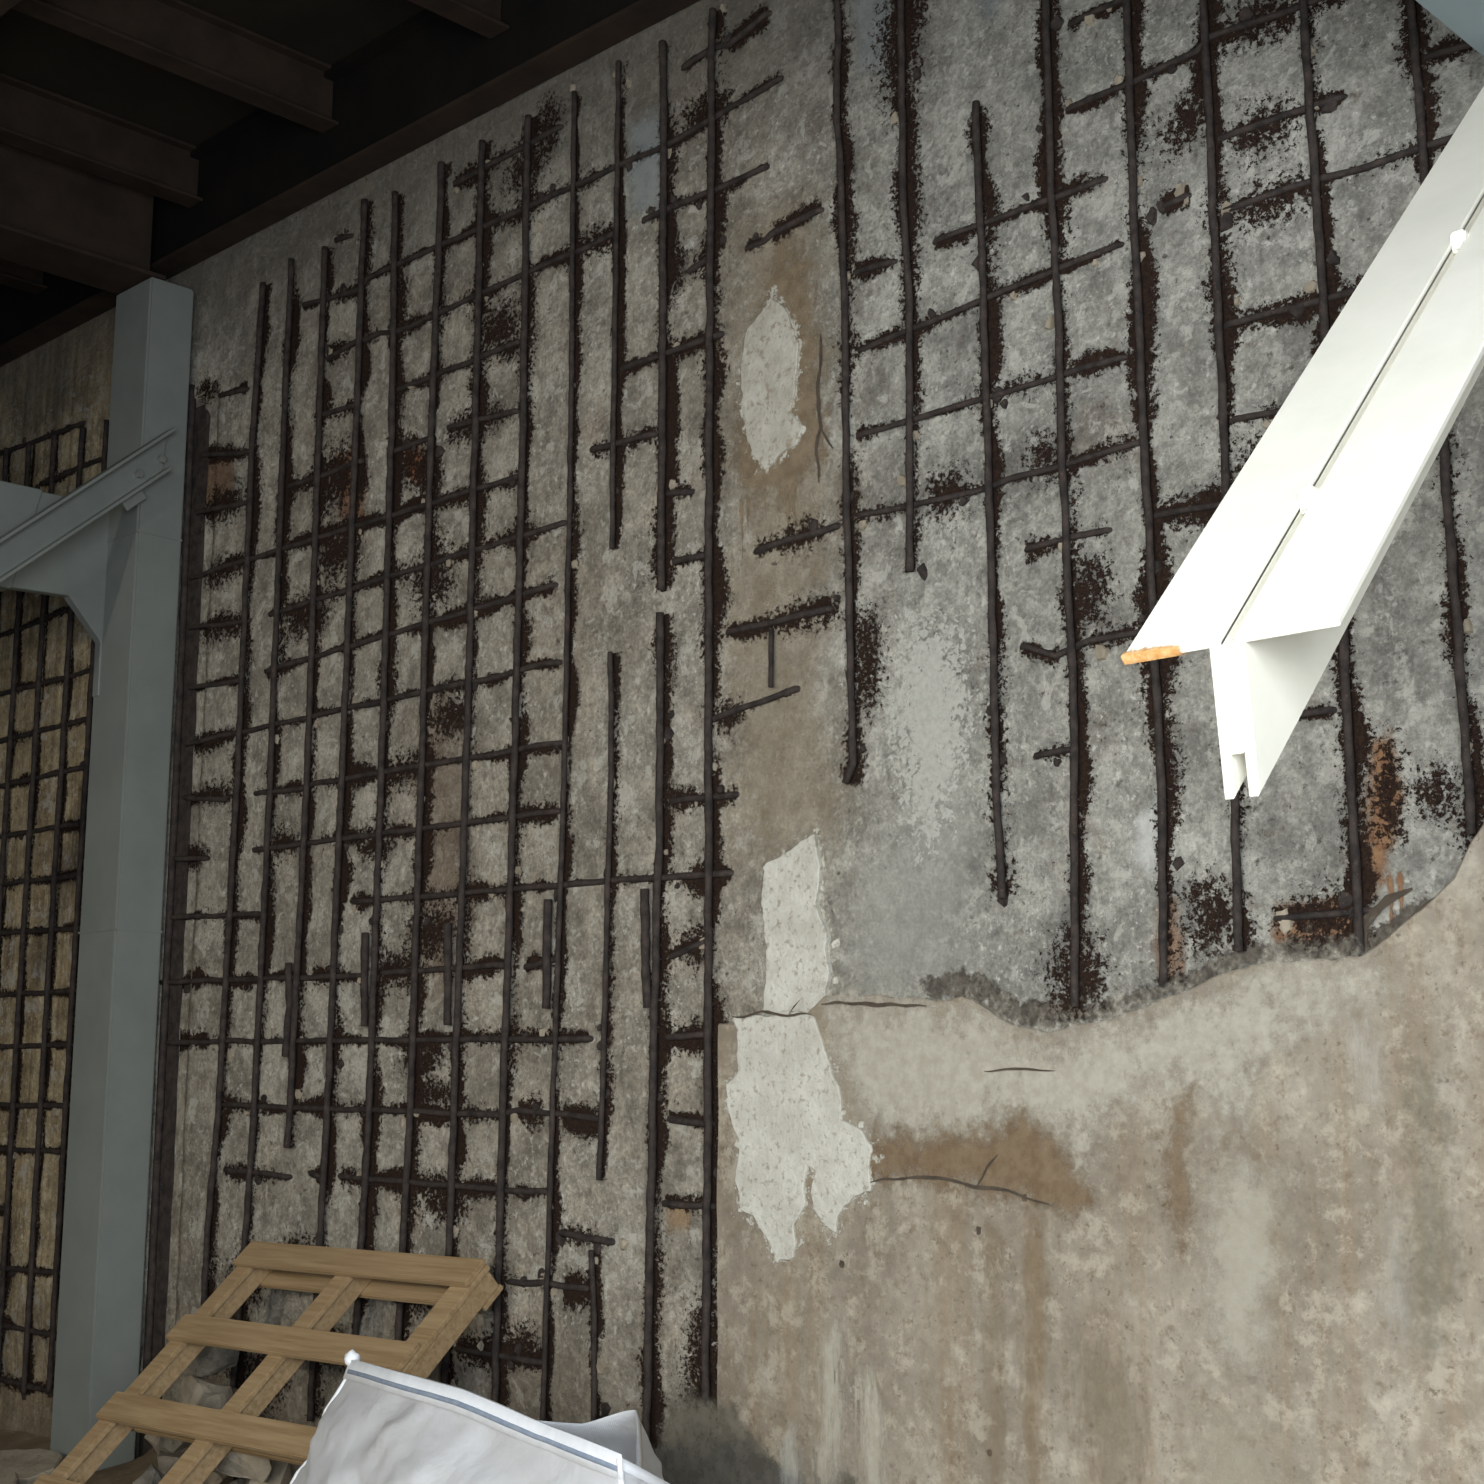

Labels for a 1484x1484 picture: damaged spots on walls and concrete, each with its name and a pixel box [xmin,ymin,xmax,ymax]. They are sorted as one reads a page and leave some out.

spalling [744,196,825,253]
flaking render [735,285,807,475]
spalling [0,419,109,494]
rust [1121,646,1182,665]
rust [427,687,479,754]
rust [1366,737,1404,923]
spalling [0,591,95,1400]
crack [732,1000,926,1018]
crack [984,1065,1054,1073]
crack [870,1154,1050,1205]
leakage [870,1108,1093,1211]
rust [207,1352,268,1385]